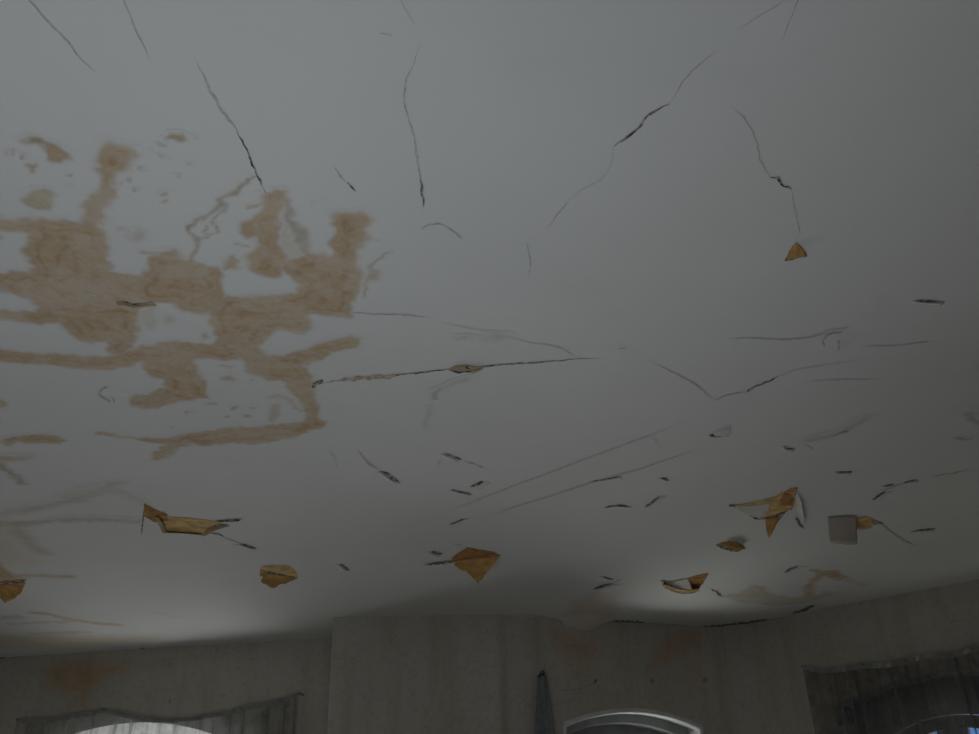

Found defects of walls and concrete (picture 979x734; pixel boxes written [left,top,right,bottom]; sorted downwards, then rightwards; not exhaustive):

crack [28,0,94,71]
crack [197,64,266,193]
crack [400,0,461,239]
crack [548,56,710,227]
crack [734,109,800,233]
damp [0,129,395,462]
crack [312,369,450,388]
crack [350,312,627,367]
crack [654,342,926,401]
damp [717,568,874,607]